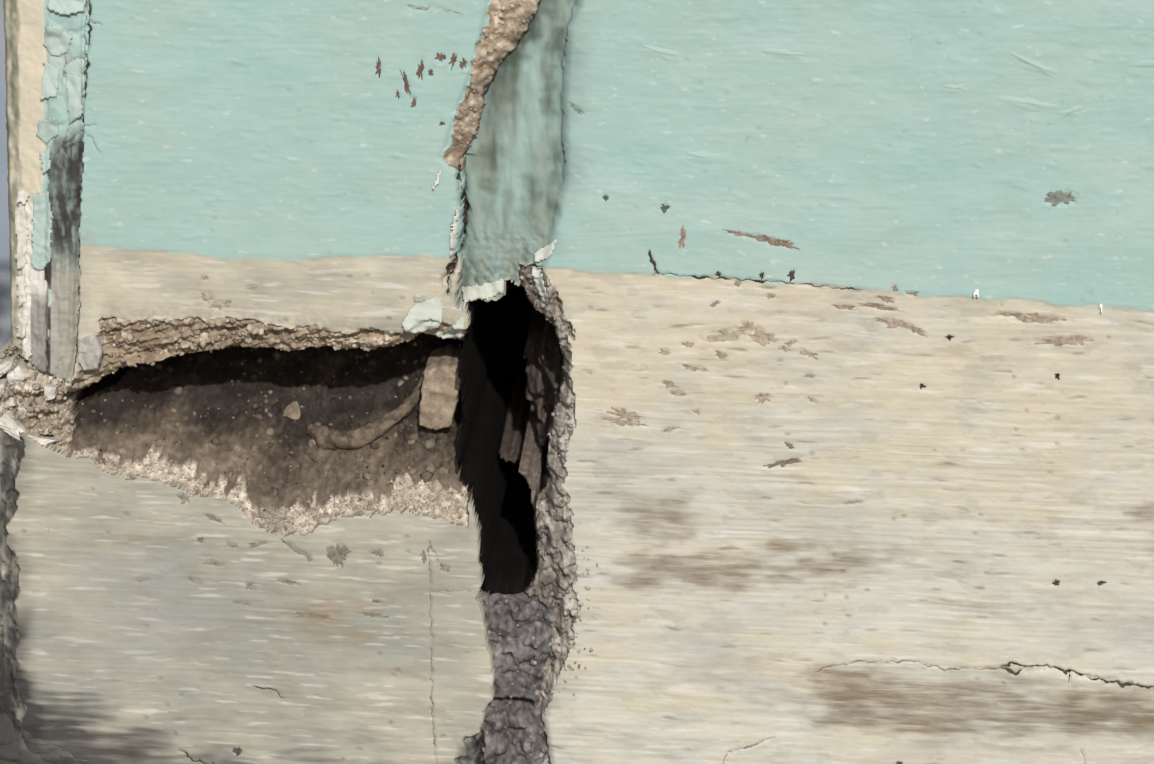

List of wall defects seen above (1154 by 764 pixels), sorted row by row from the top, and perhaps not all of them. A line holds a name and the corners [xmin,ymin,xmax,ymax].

peeling [36,0,86,174]
spalling [395,0,541,190]
peeling [532,239,556,305]
spalling [0,189,504,563]
peeling [326,544,351,568]
crack [427,541,470,763]
spalling [455,724,486,764]
crack [466,728,485,764]
crack [723,737,776,764]
damp [822,673,1010,732]
crack [816,660,1153,689]
damp [1059,698,1154,731]